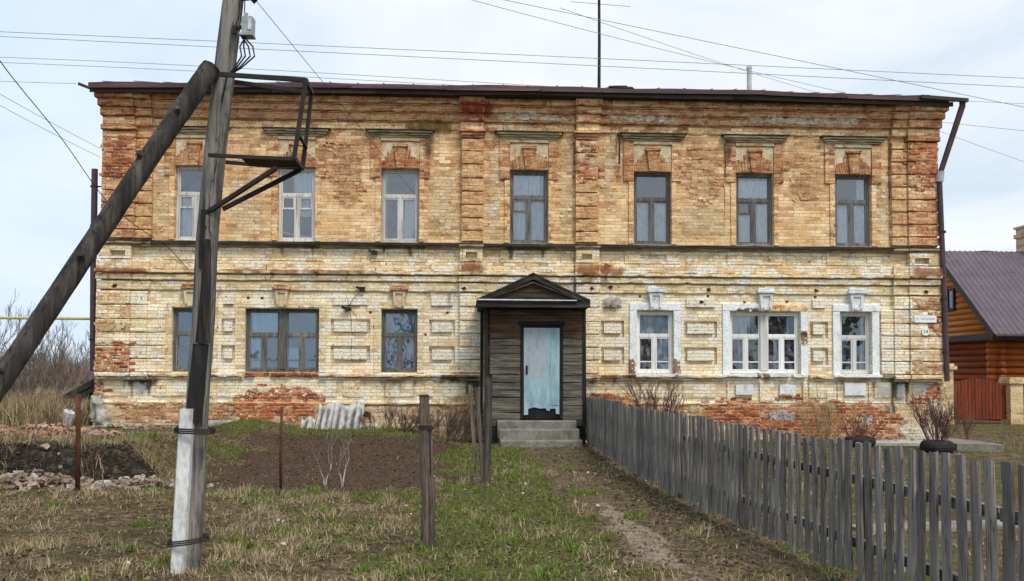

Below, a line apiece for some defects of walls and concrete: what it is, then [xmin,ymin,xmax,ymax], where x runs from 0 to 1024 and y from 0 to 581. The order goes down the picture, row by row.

spalling [99,134,140,177]
spalling [903,142,939,191]
spalling [93,318,186,424]
spalling [208,371,325,423]
spalling [670,394,916,440]